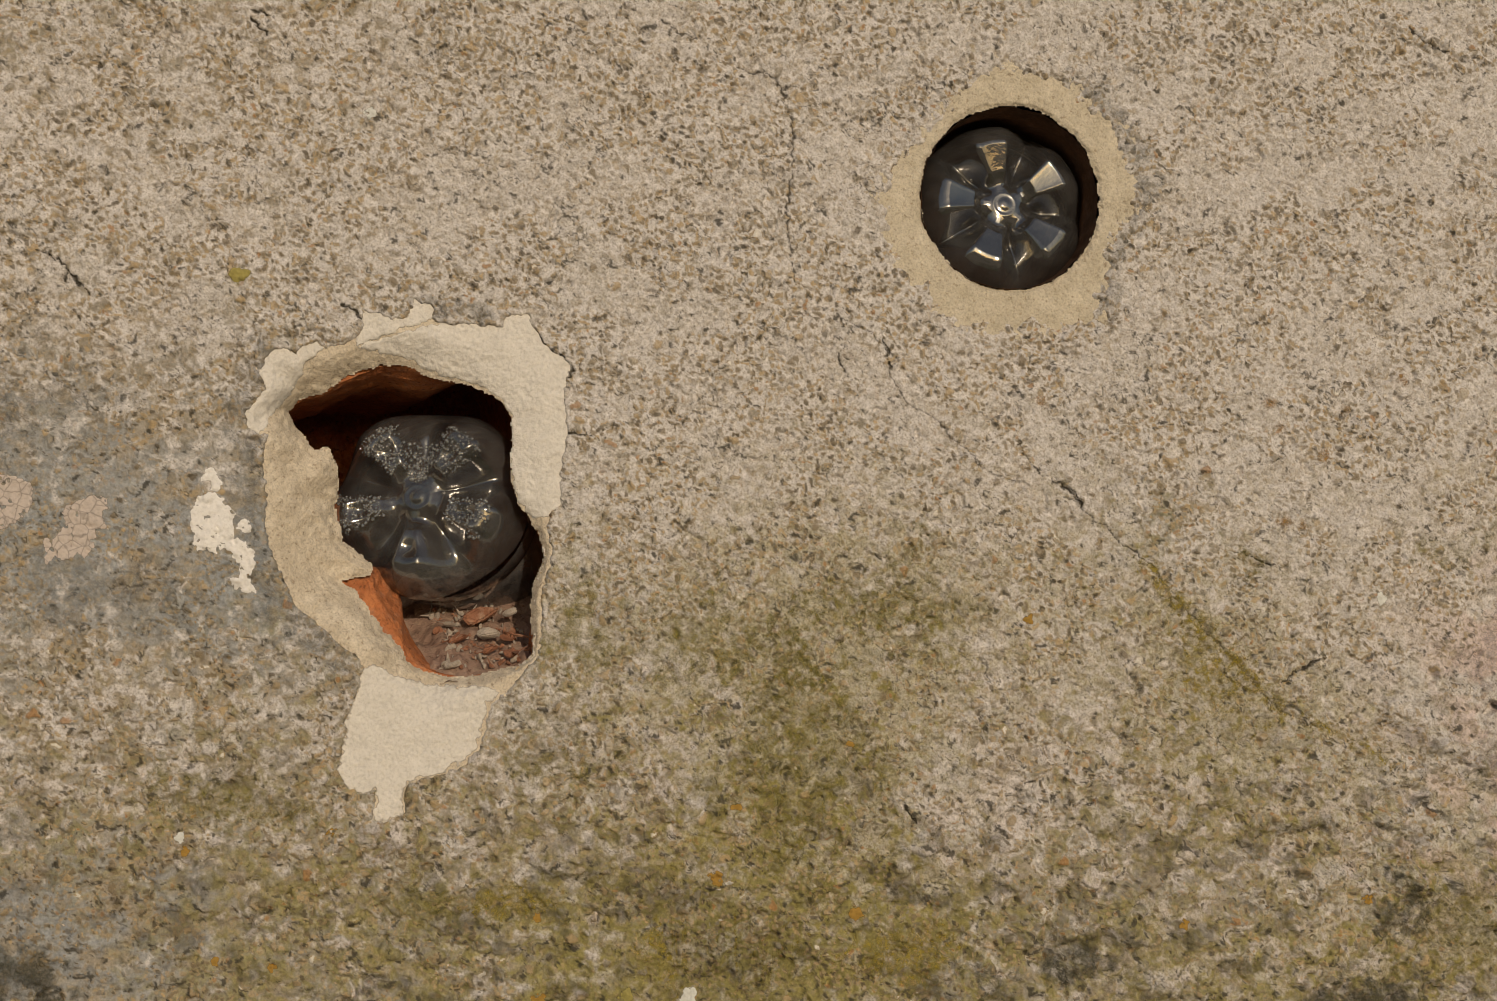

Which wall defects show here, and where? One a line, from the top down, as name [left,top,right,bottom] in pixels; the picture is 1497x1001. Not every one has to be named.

spalling [190,299,570,823]
crack [1023,454,1332,731]
water stain [1136,556,1393,768]
water stain [0,948,68,1001]
water stain [1042,937,1115,986]
water stain [1386,868,1429,935]